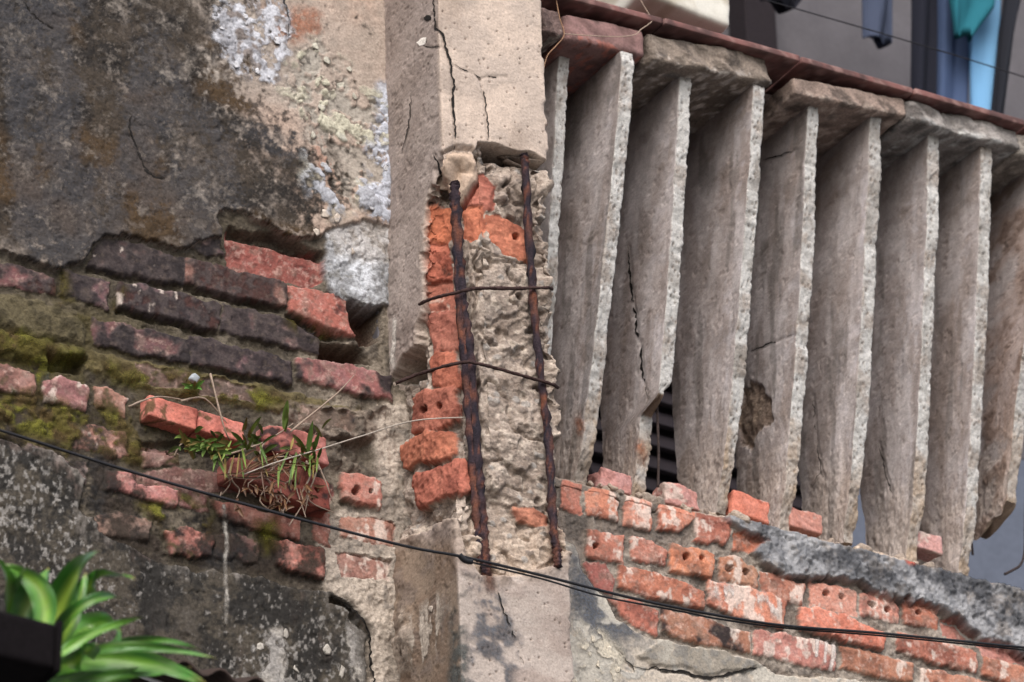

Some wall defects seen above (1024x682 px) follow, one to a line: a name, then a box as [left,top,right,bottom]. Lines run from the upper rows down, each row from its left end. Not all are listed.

crack [128,116,163,178]
leakage [0,0,363,269]
crack [423,0,496,180]
spalling [0,75,561,682]
crack [628,248,648,397]
spalling [738,380,774,453]
spalling [554,477,1024,682]